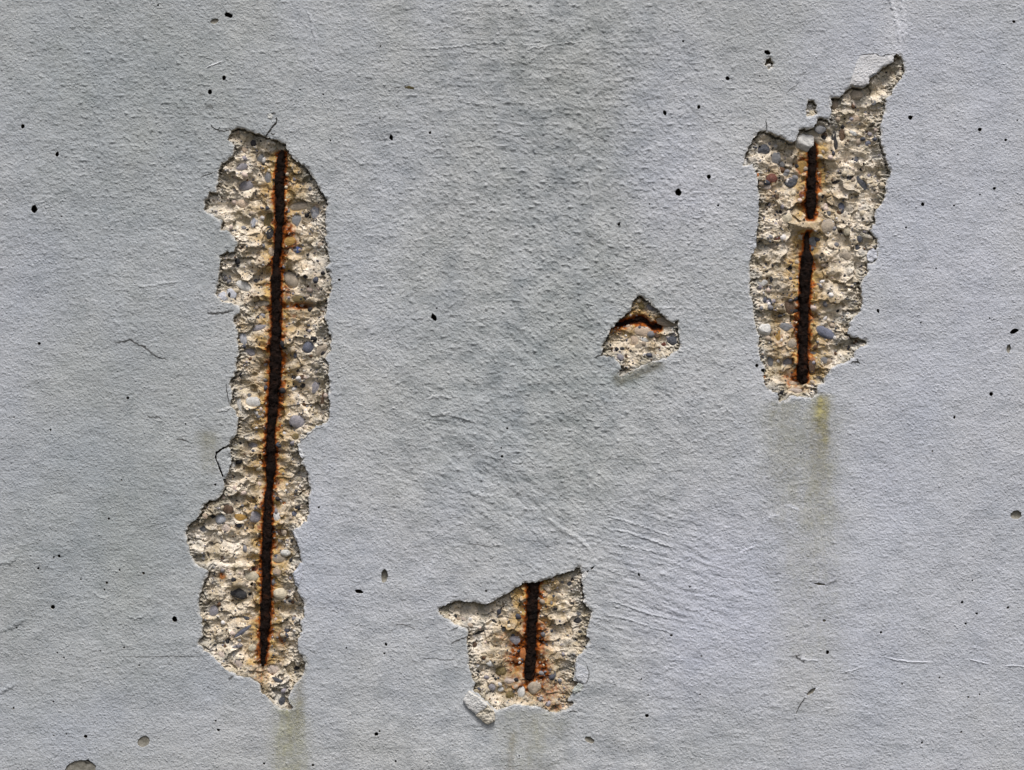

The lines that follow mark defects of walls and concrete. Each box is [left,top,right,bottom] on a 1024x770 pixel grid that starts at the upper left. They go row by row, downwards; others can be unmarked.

spalling [186,129,332,710]
corrosion [247,150,310,666]
corrosion [610,303,663,335]
spalling [601,296,680,377]
corrosion [783,142,828,387]
spalling [743,54,904,402]
spalling [439,568,592,713]
corrosion [507,579,563,710]